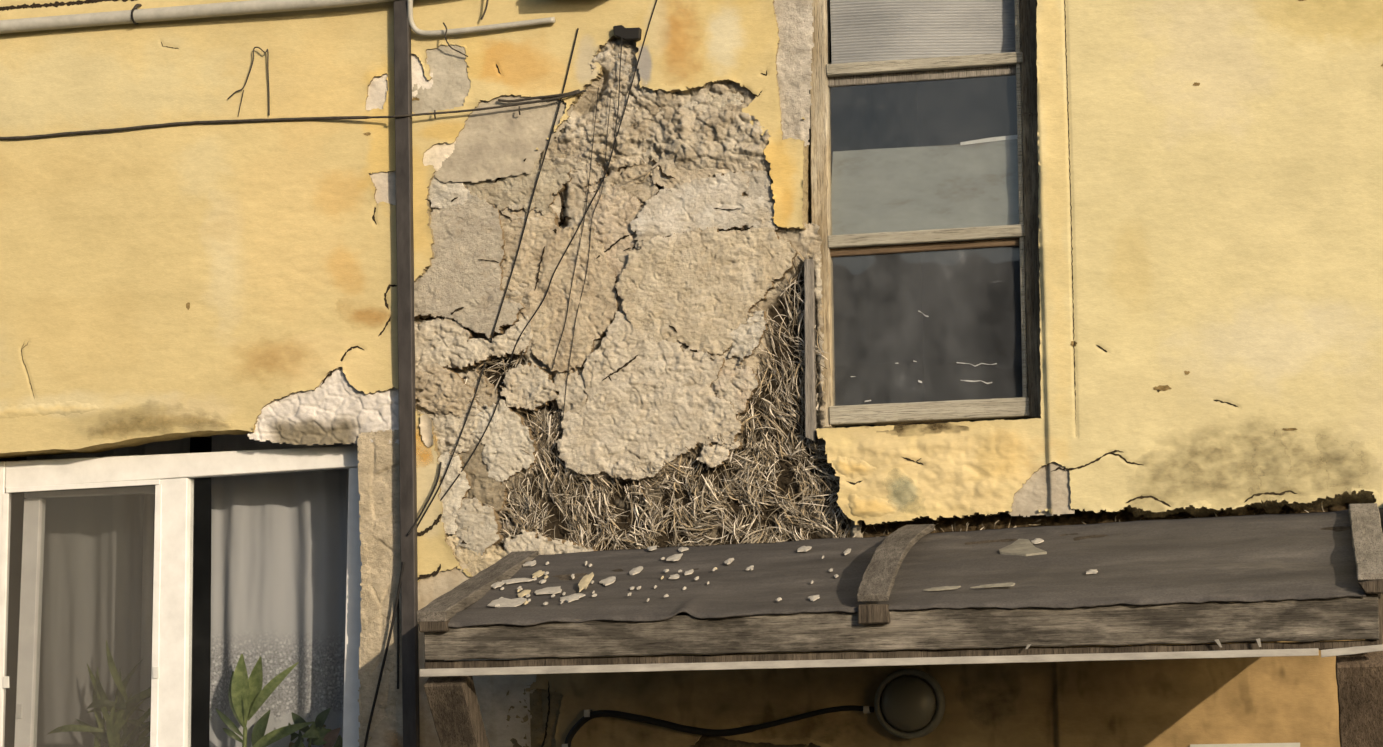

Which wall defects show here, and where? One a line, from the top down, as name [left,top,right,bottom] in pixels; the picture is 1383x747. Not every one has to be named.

peeling [366,74,388,110]
peeling [370,171,396,205]
spalling [411,0,1376,747]
crack [1051,450,1171,507]
peeling [248,367,403,747]